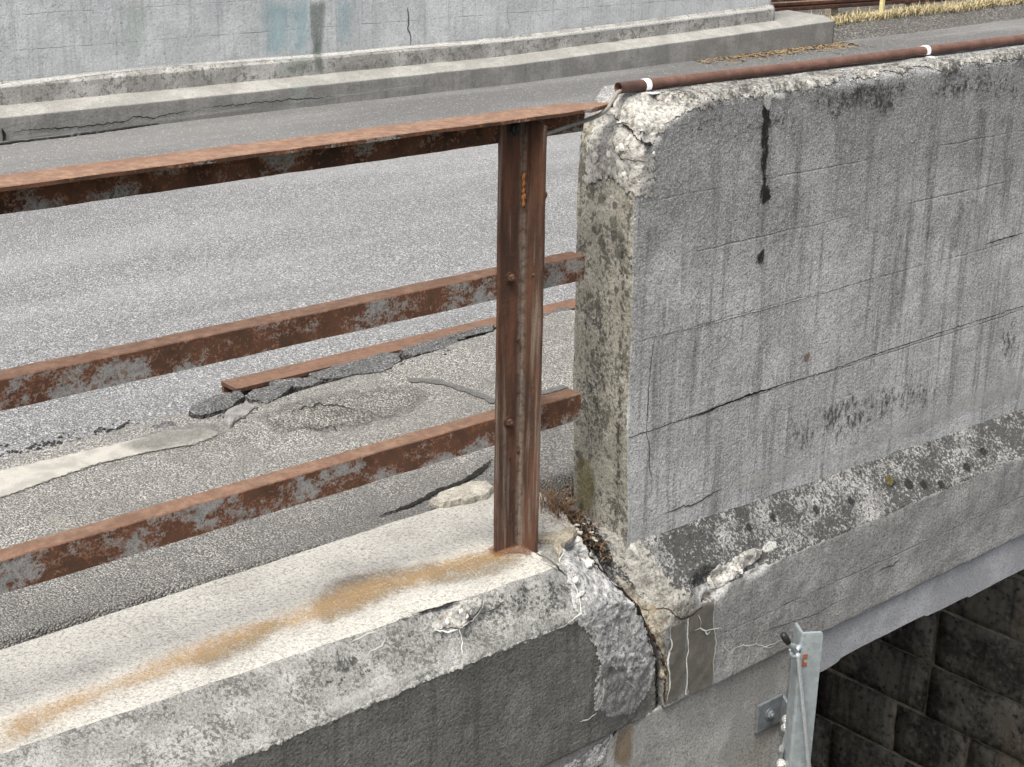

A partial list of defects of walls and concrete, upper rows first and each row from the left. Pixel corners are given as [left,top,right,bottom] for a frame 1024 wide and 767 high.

crack [2,96,331,142]
spalling [584,45,1024,199]
leakage [814,76,914,119]
leakage [931,72,1018,100]
leakage [576,217,626,516]
crack [629,272,1023,515]
leakage [791,378,1020,452]
spalling [249,527,695,767]
crack [563,512,846,707]
spalling [707,541,776,589]